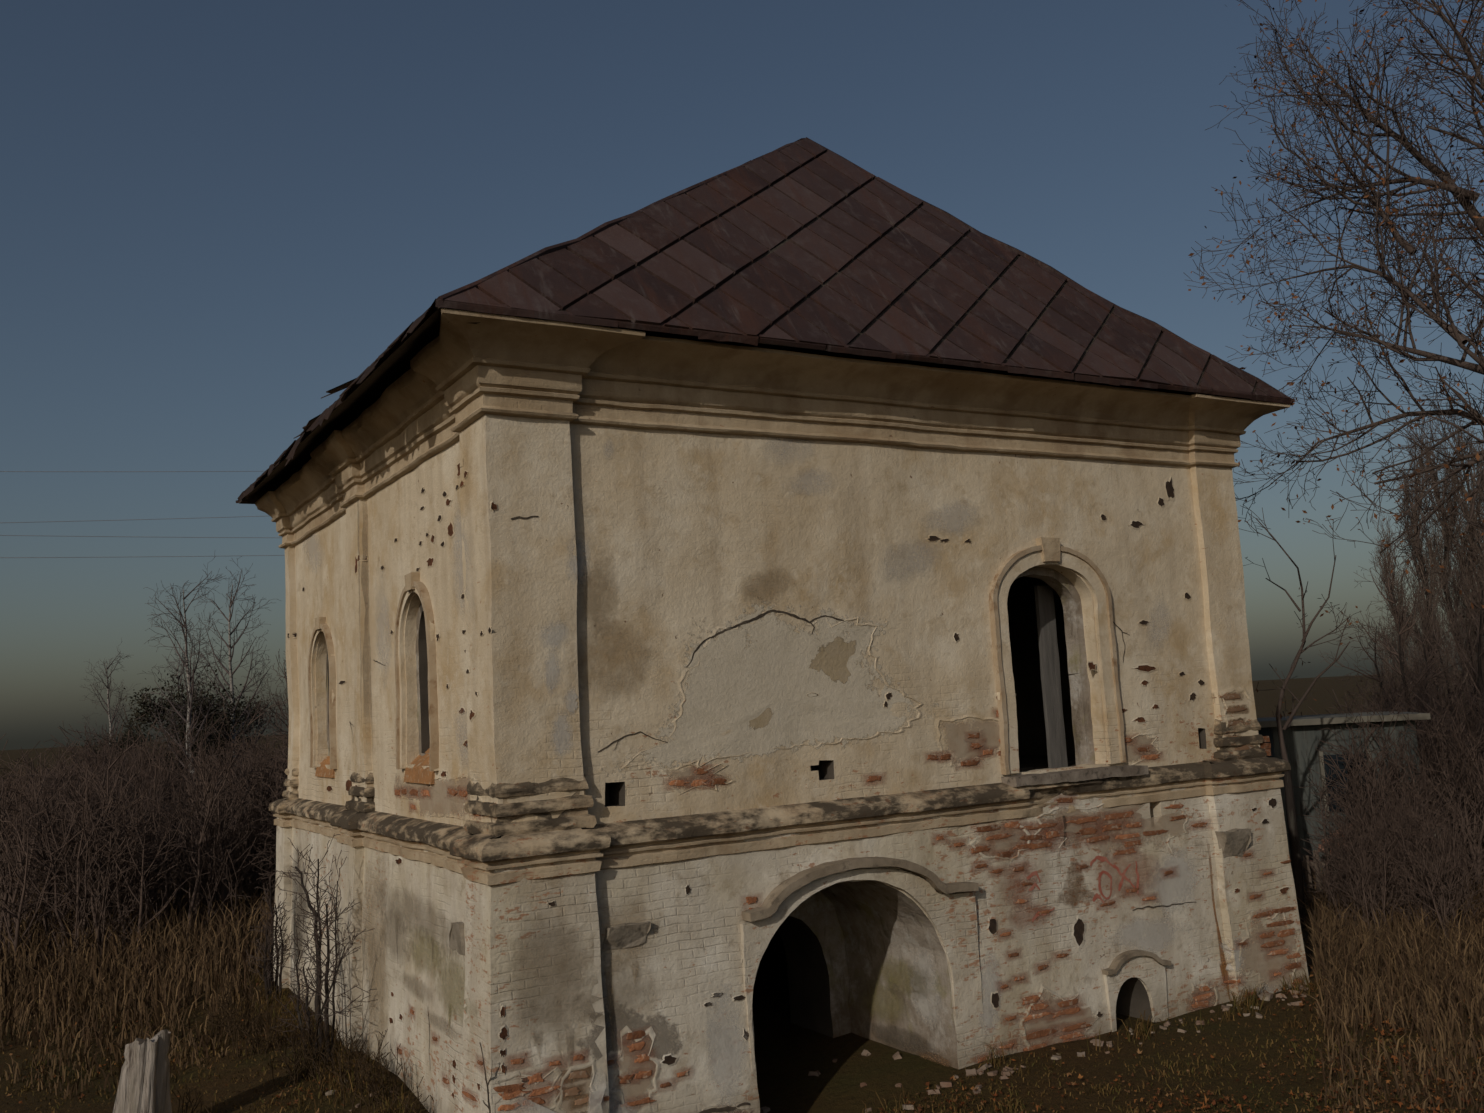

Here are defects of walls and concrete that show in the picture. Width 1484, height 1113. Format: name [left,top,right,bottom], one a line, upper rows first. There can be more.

crack [686,609,844,667]
spalling [458,691,478,721]
peeling [602,597,1001,796]
crack [598,731,668,752]
flaking render [394,770,484,821]
spalling [1250,796,1278,825]
flaking render [936,797,1208,1063]
flaking render [1188,860,1302,1012]
flaking render [442,1004,688,1113]
flaking render [701,1101,754,1113]